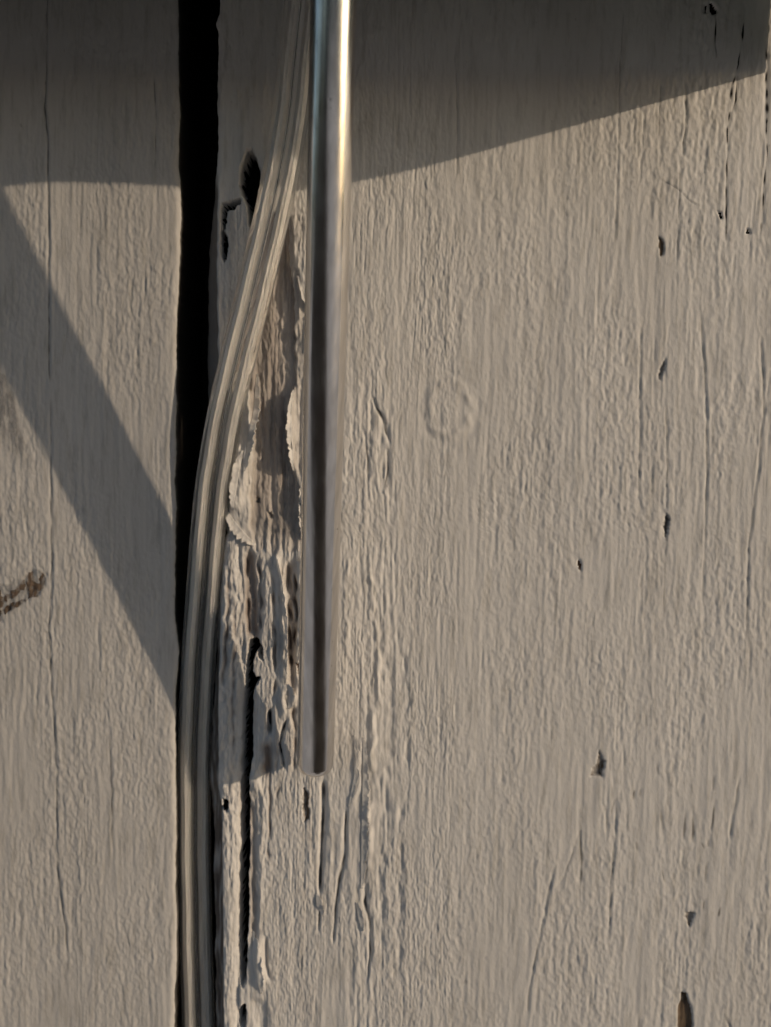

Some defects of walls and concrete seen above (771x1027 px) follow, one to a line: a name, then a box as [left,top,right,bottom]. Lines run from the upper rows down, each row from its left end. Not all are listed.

crack [725,25,744,234]
crack [762,51,770,206]
peeling [226,229,305,546]
peeling [276,550,300,709]